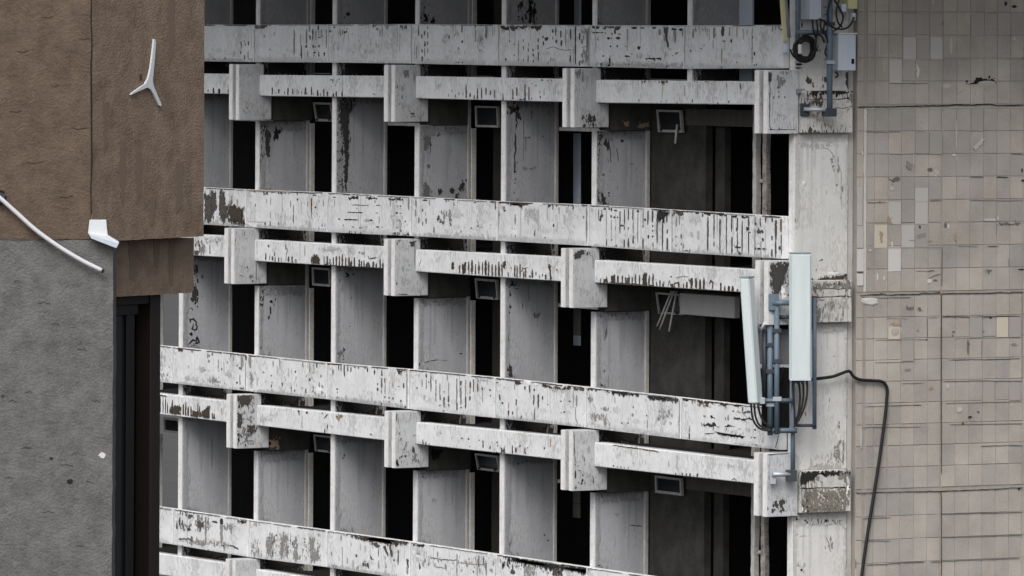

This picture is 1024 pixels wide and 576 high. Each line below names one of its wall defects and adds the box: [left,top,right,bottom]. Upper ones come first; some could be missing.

leakage [204,0,846,251]
spalling [204,190,245,226]
leakage [154,75,789,576]
spalling [169,405,210,419]
peeling [514,381,571,413]
leakage [767,259,852,576]
peeling [800,485,850,513]
spalling [355,535,425,561]